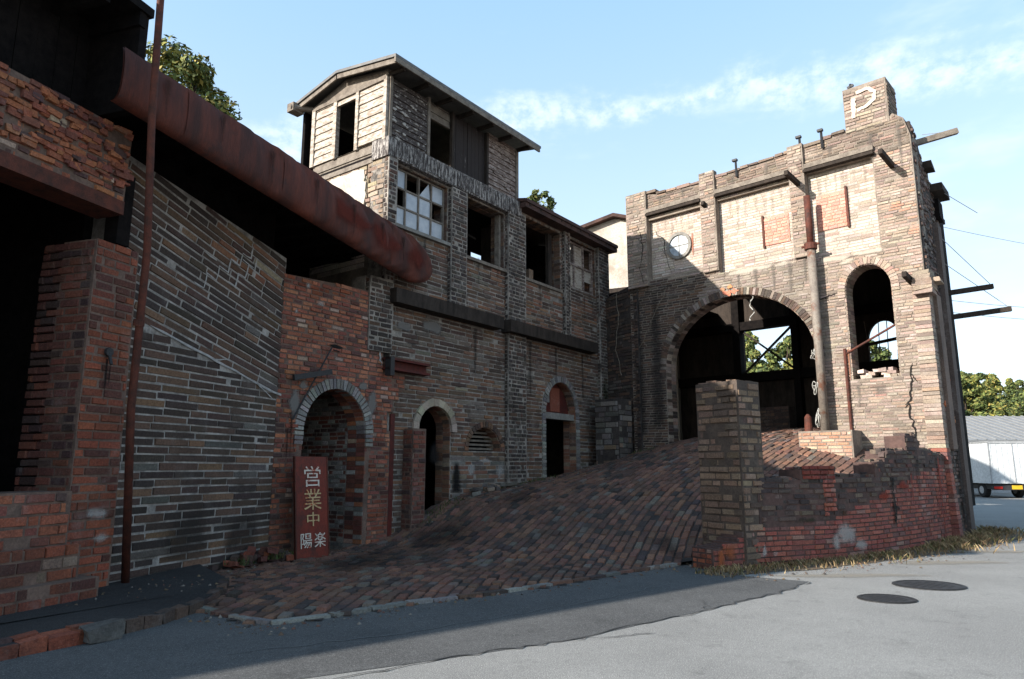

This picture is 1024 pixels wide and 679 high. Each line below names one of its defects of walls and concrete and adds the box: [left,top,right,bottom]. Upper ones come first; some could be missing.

crack [905,365,919,448]